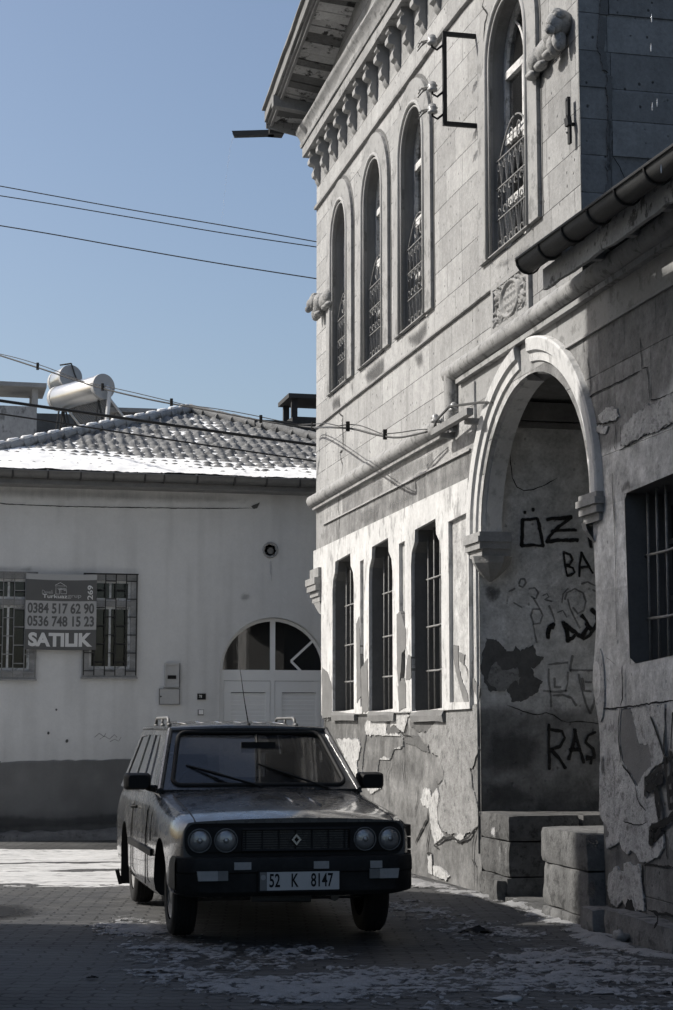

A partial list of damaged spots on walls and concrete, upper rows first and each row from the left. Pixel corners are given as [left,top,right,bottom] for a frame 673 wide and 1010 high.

crack [587,341,673,400]
peeling [595,393,673,446]
crack [597,420,673,572]
spalling [322,667,332,721]
peeling [336,611,544,881]
peeling [599,703,673,911]